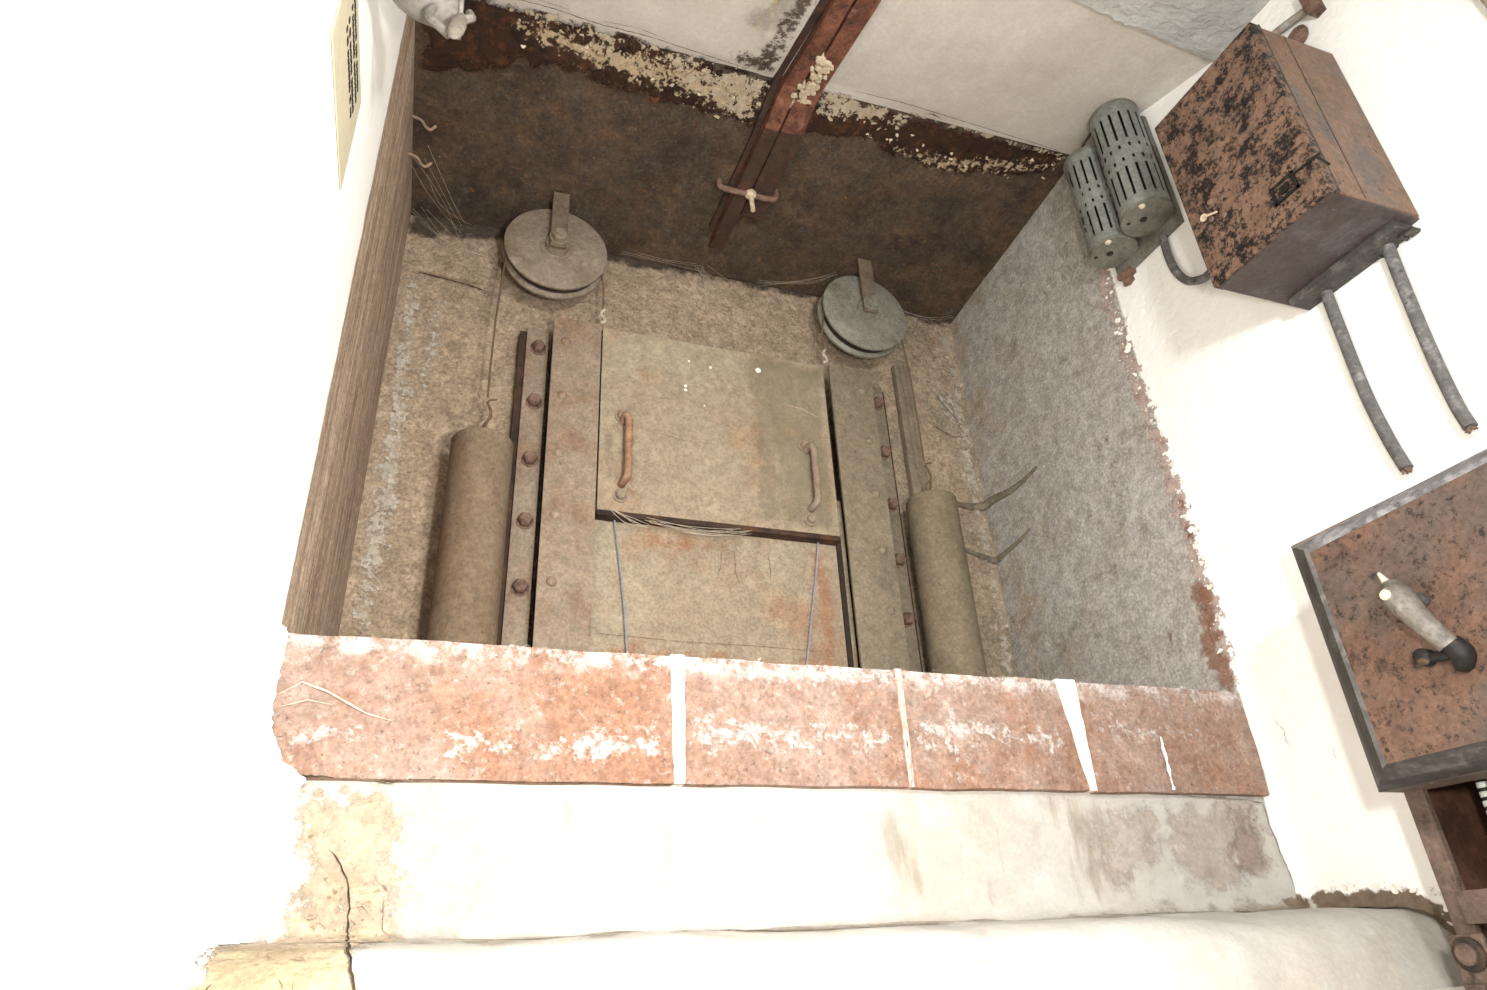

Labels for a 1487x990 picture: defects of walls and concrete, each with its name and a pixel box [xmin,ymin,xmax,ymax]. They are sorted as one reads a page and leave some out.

peeling [422,0,771,127]
peeling [806,90,1066,179]
corrosion [1191,582,1234,691]
peeling [176,782,505,990]
crack [329,849,396,990]